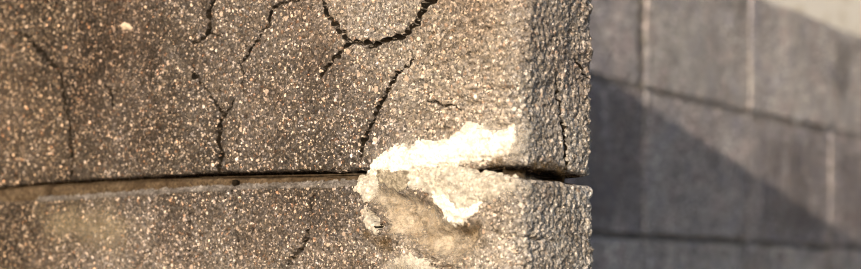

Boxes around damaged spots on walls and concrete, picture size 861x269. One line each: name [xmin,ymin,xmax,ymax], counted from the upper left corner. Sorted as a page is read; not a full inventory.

crack [320,0,437,77]
crack [18,32,74,177]
crack [191,0,300,263]
crack [358,59,415,160]
crack [427,99,462,110]
crack [553,58,589,170]